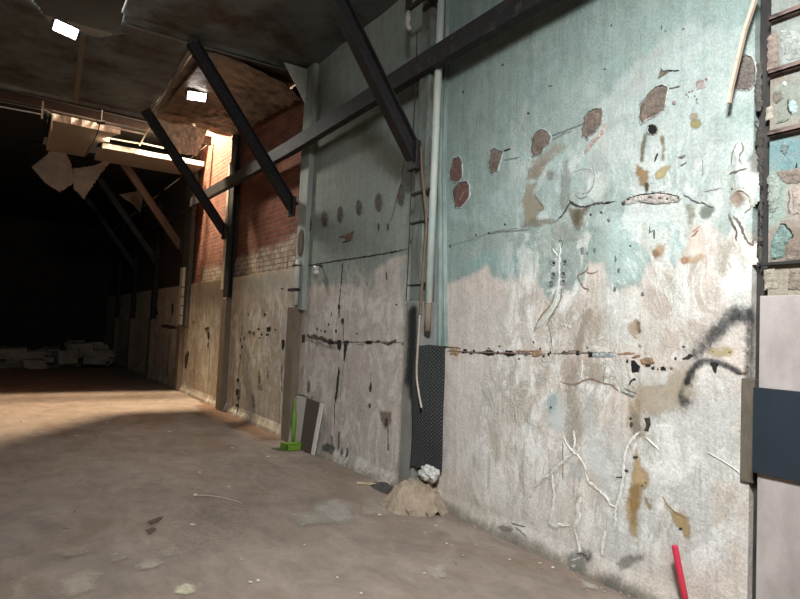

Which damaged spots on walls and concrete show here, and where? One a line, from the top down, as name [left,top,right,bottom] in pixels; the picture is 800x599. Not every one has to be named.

flaking render [639,68,708,125]
flaking render [530,108,607,157]
flaking render [309,206,344,232]
flaking render [374,193,383,212]
flaking render [449,156,471,209]
flaking render [488,147,520,176]
crack [559,200,615,222]
peeling [734,29,800,290]
crack [308,248,408,426]
water stain [498,309,691,572]